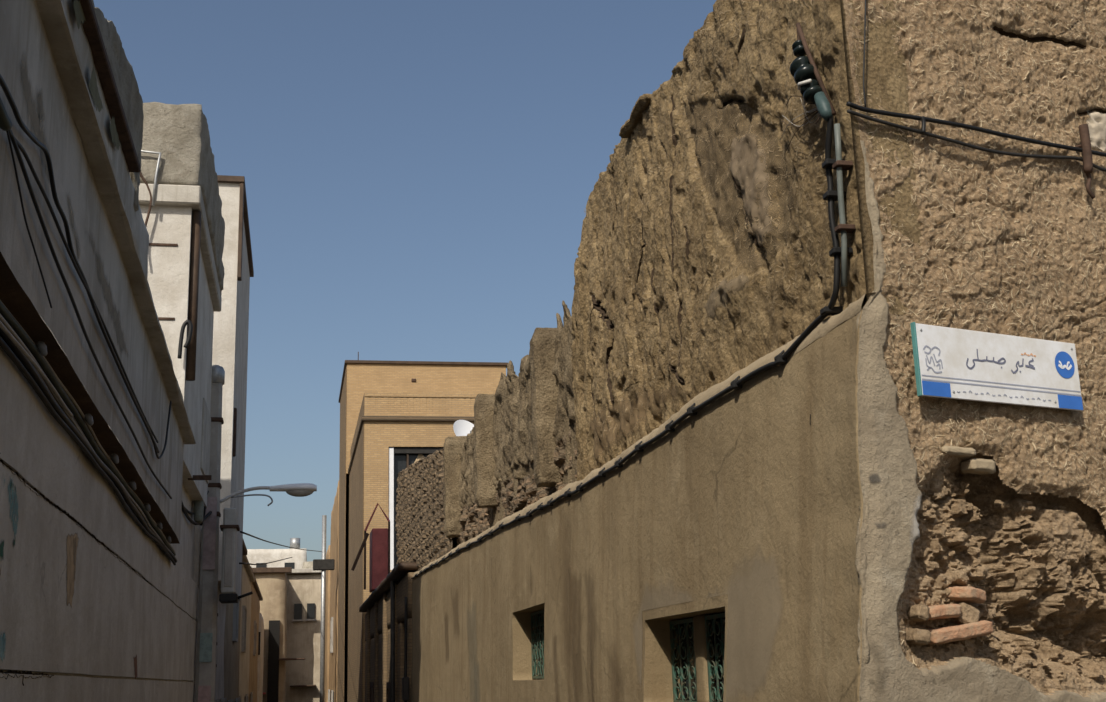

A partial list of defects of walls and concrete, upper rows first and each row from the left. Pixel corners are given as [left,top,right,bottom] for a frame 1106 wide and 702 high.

crack [716,99,745,109]
crack [993,21,1106,48]
crack [1079,107,1106,115]
crack [612,96,690,383]
peeling [686,104,797,270]
crack [732,175,759,245]
crack [590,295,639,441]
spalling [900,446,1106,693]